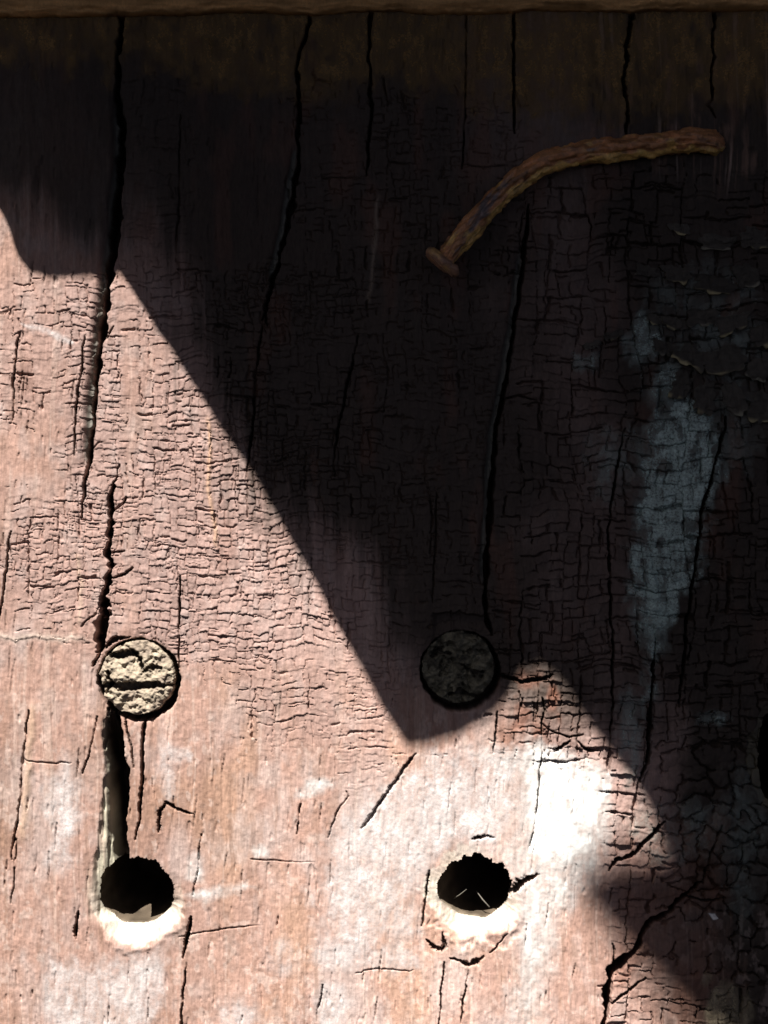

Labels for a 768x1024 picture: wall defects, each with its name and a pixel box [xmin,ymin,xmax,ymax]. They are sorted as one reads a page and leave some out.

crack [0,13,398,717]
crack [482,160,768,1024]
damp [629,402,718,654]